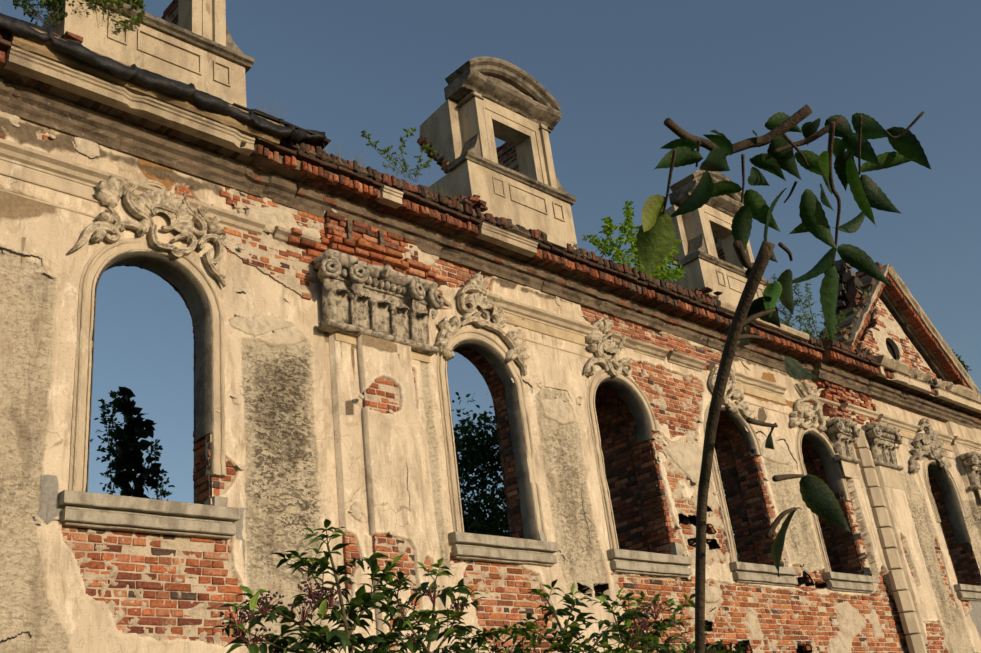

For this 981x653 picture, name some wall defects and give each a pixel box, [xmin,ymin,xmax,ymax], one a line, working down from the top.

water stain [0,188,55,218]
spalling [210,187,337,300]
spalling [359,378,400,414]
water stain [38,475,62,523]
spalling [577,306,910,653]
spalling [342,533,361,607]
spalling [372,531,431,651]